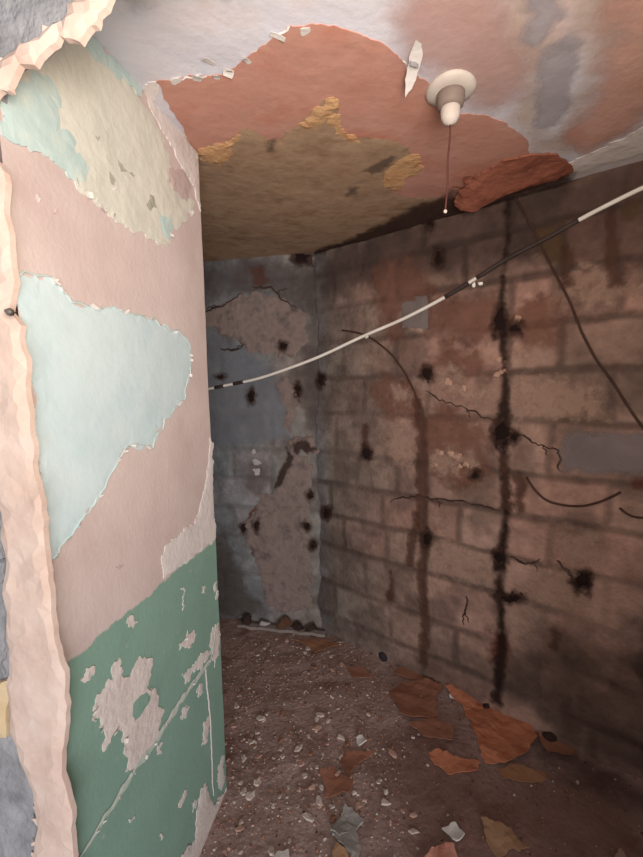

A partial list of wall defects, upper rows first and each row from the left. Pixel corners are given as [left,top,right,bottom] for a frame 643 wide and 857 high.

peeling [0,0,530,246]
damp [544,0,643,153]
crack [205,286,298,313]
peeling [0,162,193,857]
peeling [161,438,216,579]
damp [406,400,430,667]
crack [394,494,500,511]
crack [427,391,496,420]
damp [497,333,511,419]
damp [491,444,527,707]
crack [520,434,562,472]
peeling [178,755,261,857]